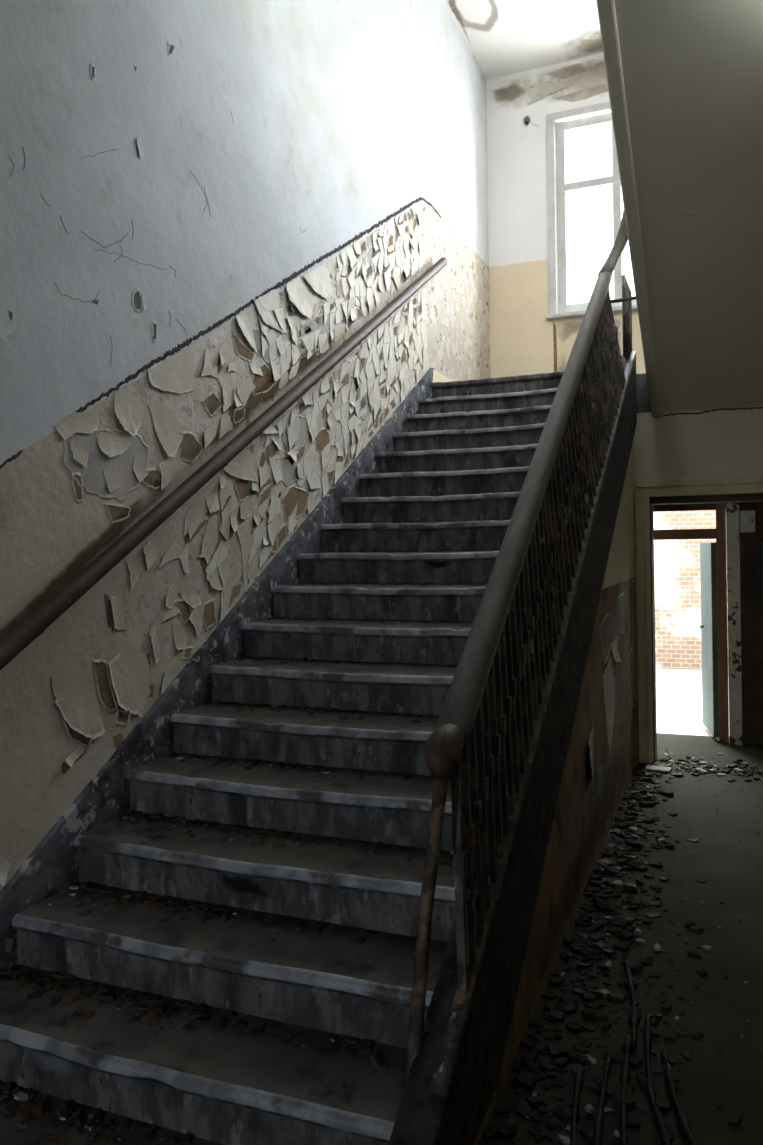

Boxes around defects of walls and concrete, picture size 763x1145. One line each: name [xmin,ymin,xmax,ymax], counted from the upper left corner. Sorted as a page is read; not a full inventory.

peeling [494,83,527,102]
peeling [544,63,608,102]
peeling [54,197,441,525]
peeling [51,286,436,774]
peeling [0,855,11,886]
spalling [222,876,266,896]